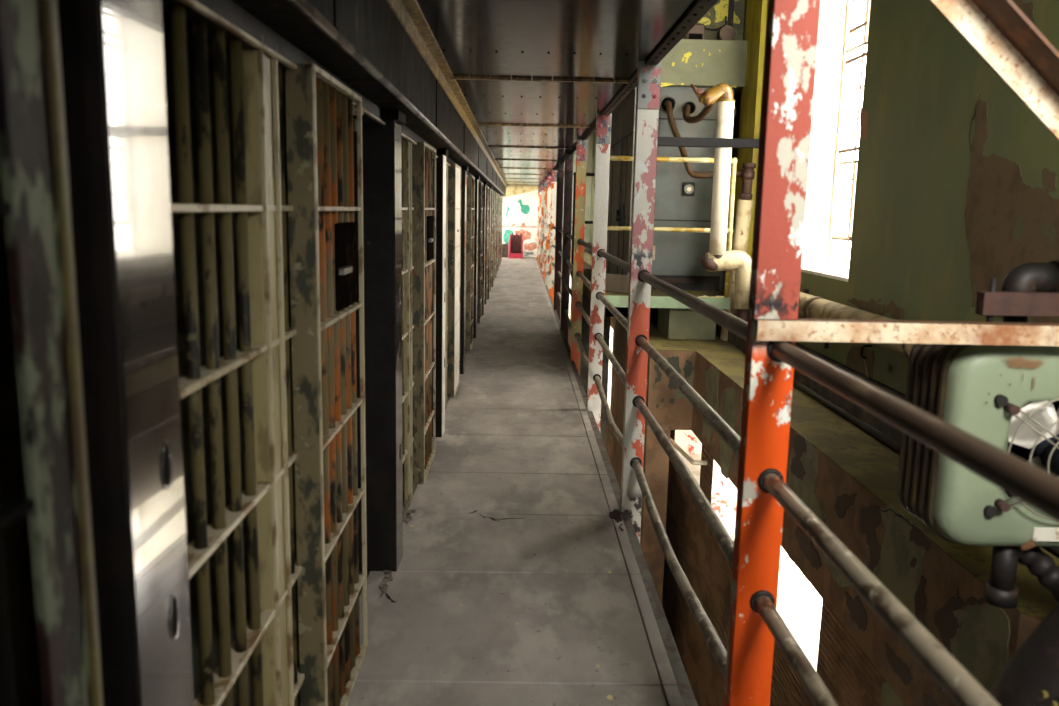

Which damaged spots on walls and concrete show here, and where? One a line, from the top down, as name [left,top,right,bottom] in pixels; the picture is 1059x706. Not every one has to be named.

peeling [964,100,1059,307]
peeling [873,505,925,617]
peeling [950,603,1010,693]